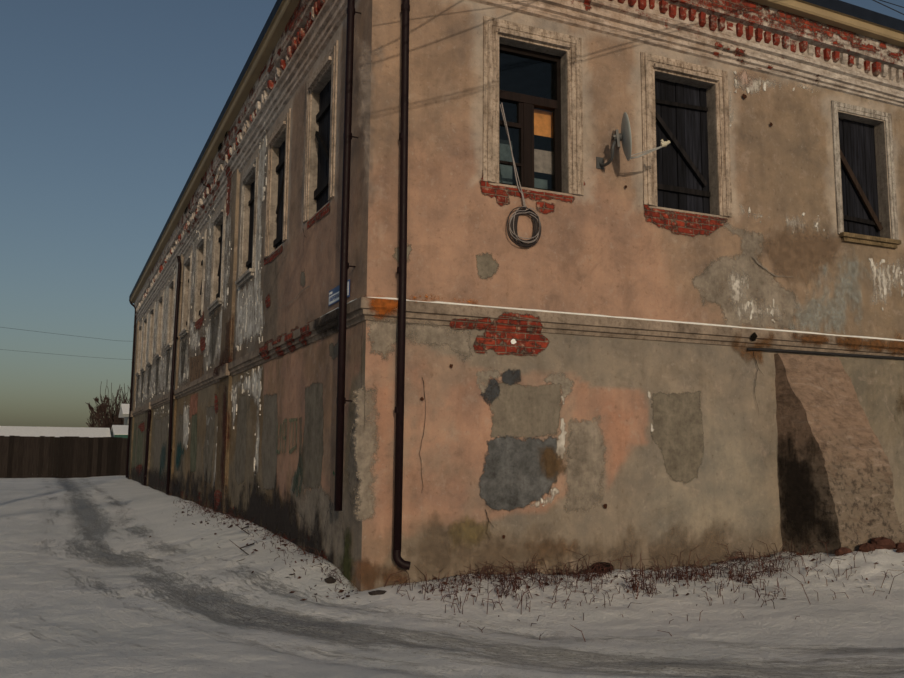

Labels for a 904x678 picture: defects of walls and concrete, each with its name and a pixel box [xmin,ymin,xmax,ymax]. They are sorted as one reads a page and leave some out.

flaking render [710,0,904,61]
peeling [713,42,781,127]
peeling [135,0,314,473]
flaking render [480,170,575,214]
flaking render [643,201,728,237]
peeling [728,266,785,324]
peeling [868,258,904,311]
flaking render [449,312,550,356]
peeling [556,418,567,459]
water stain [128,442,334,564]
peeling [533,488,559,507]
water stain [777,437,837,543]